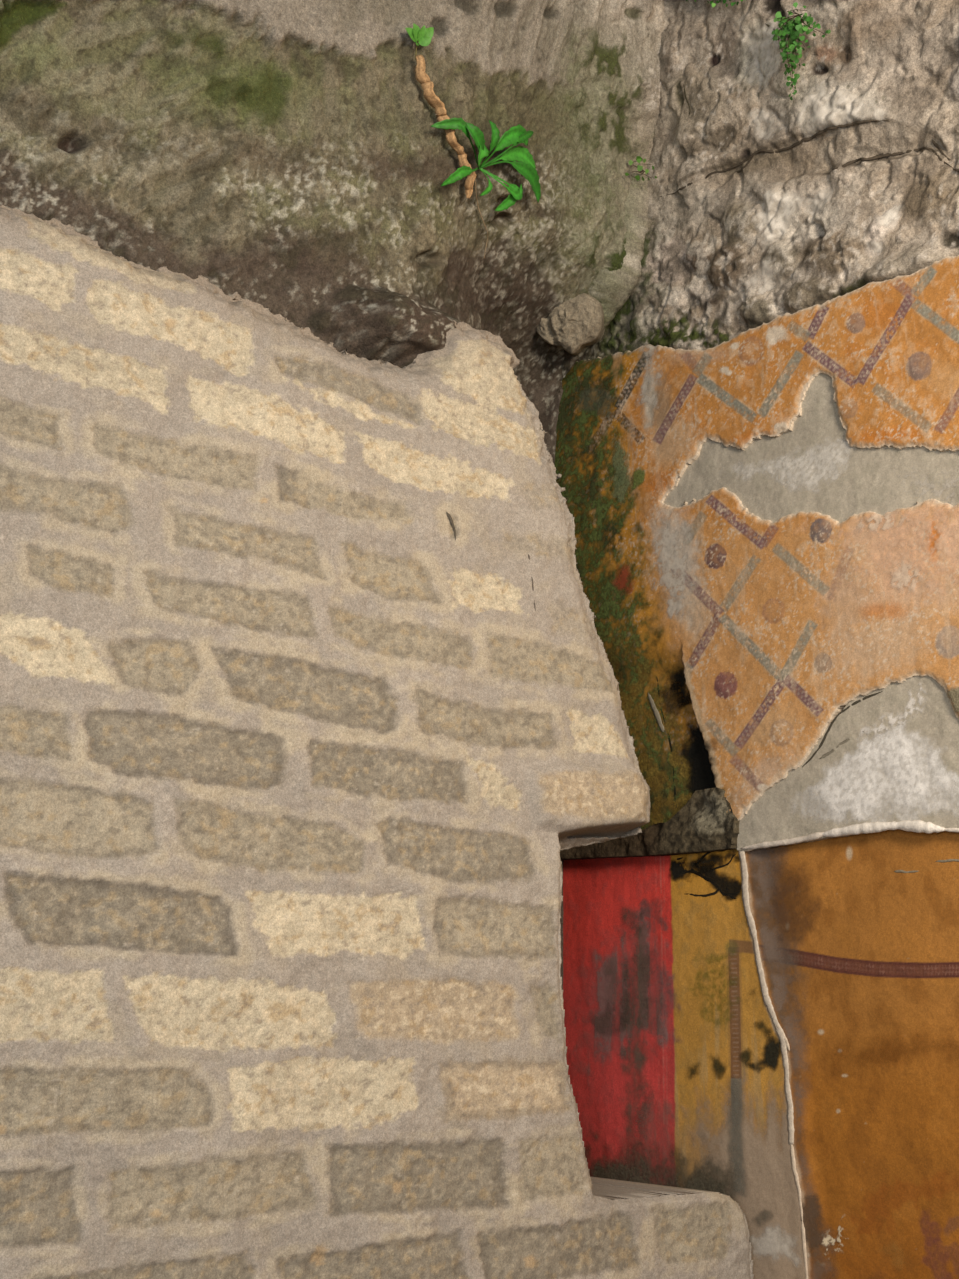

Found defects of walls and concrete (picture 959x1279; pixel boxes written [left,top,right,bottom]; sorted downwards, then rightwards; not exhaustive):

crack [660,119,889,197]
crack [832,140,959,172]
leakage [612,444,645,502]
flaking render [664,373,959,592]
peeling [654,522,693,617]
leakage [594,906,673,1070]
leakage [741,846,809,1116]
flaking render [696,676,959,1279]
leakage [714,1059,725,1077]
leakage [802,1195,843,1279]